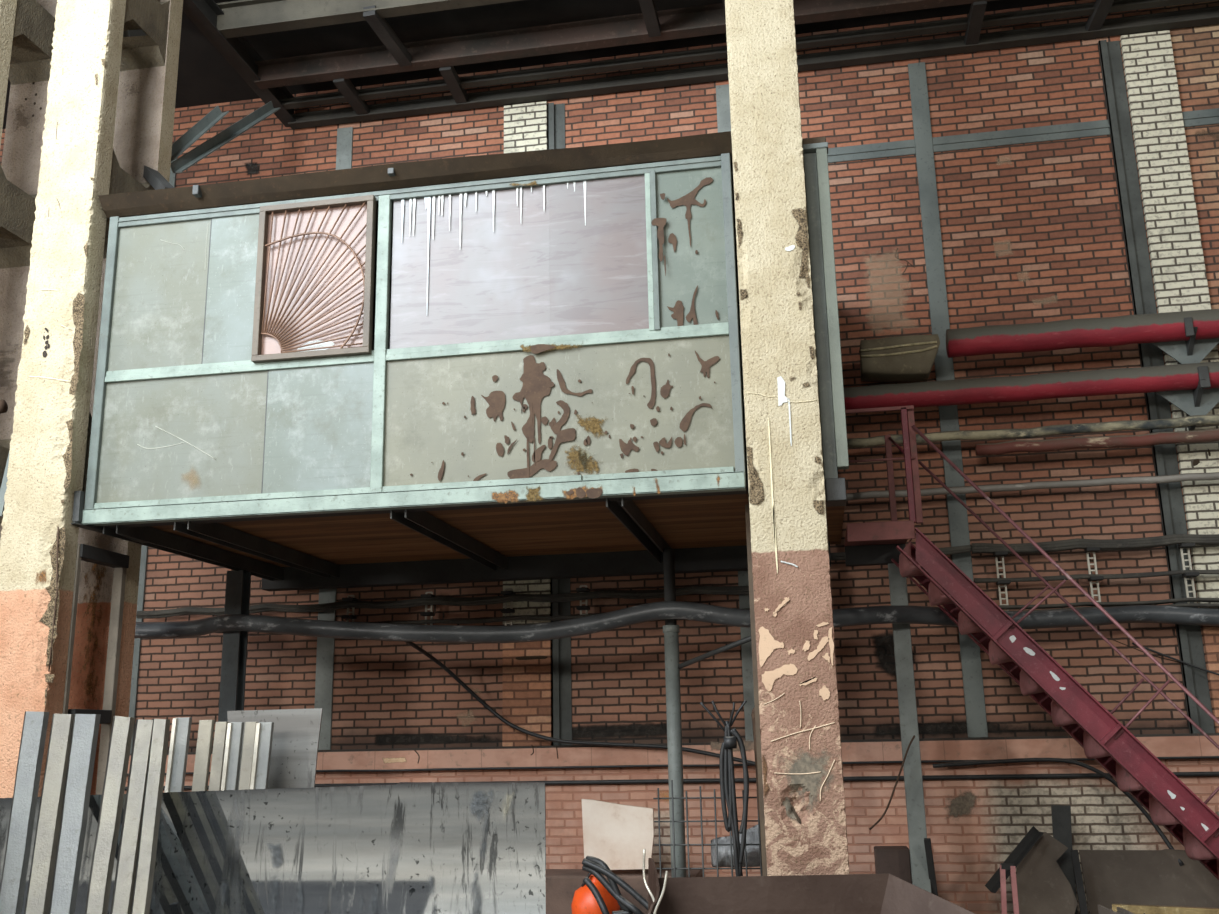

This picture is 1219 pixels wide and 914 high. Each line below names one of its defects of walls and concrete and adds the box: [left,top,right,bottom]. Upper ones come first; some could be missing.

damp [516,185,545,216]
damp [409,190,495,309]
spalling [792,208,810,310]
spalling [69,293,85,395]
corrosion [577,415,606,437]
spalling [61,419,73,503]
corrosion [492,487,542,503]
corrosion [563,446,603,499]
spalling [747,447,764,505]
spalling [813,500,824,515]
peeling [759,597,834,700]
spalling [783,798,801,824]